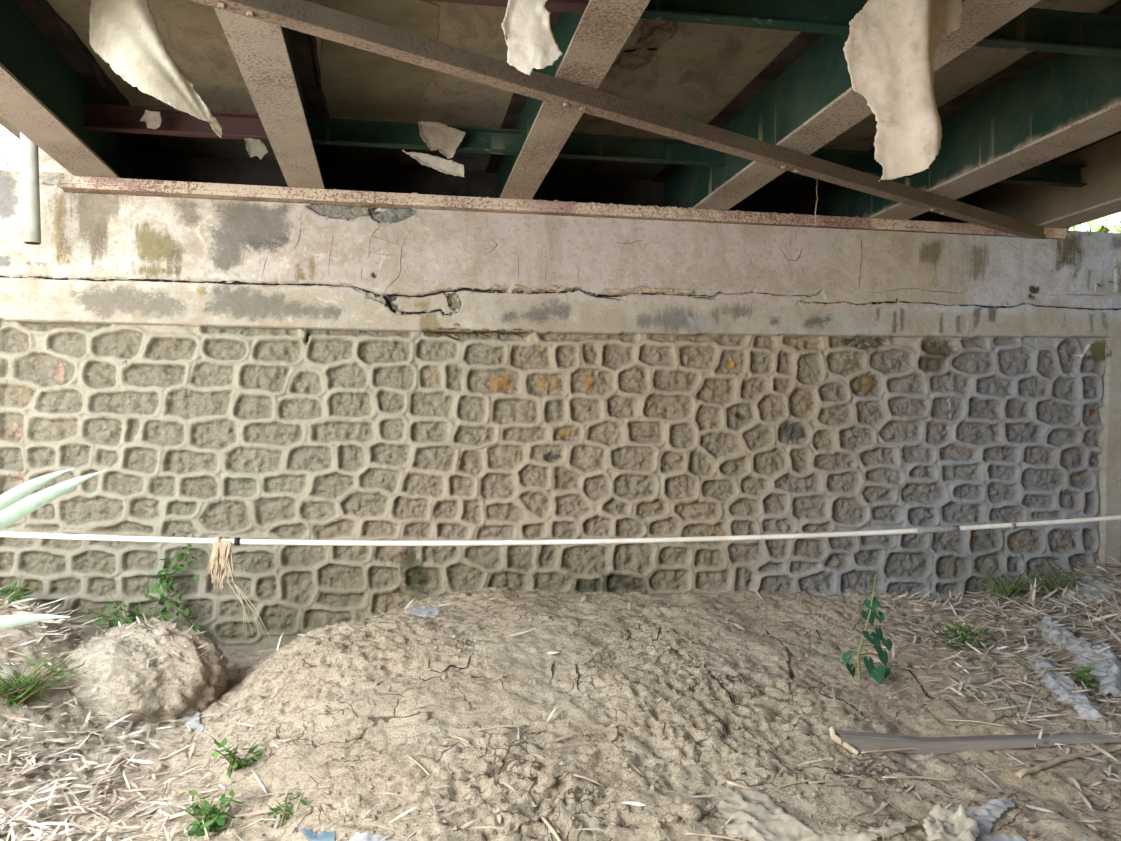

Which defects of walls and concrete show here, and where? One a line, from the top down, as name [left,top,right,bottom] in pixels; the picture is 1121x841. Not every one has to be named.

leakage [78,194,118,258]
leakage [139,266,180,276]
leakage [212,202,288,270]
crack [0,215,1121,316]